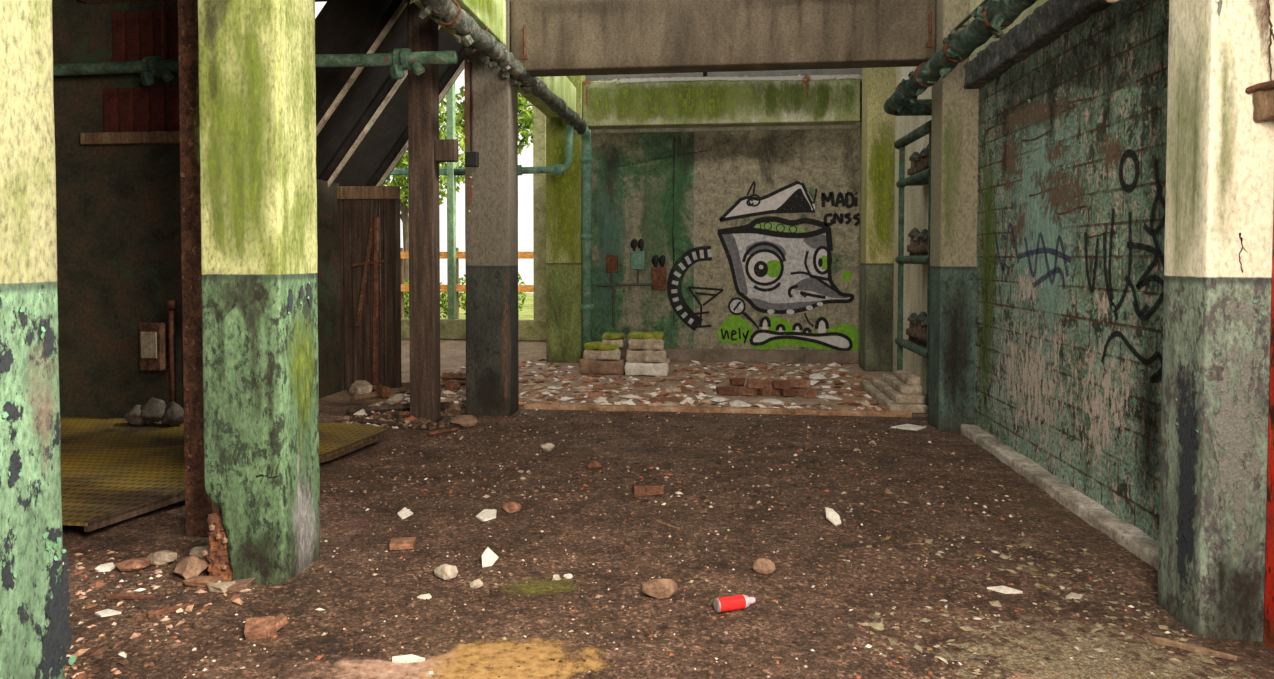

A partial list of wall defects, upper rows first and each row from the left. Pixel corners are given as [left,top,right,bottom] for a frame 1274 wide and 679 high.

damp [211,34,261,245]
peeling [984,93,1090,247]
peeling [288,282,313,314]
peeling [20,307,59,359]
peeling [0,348,15,373]
peeling [989,267,1139,477]
peeling [2,400,20,421]
peeling [0,447,23,492]
peeling [2,560,17,590]